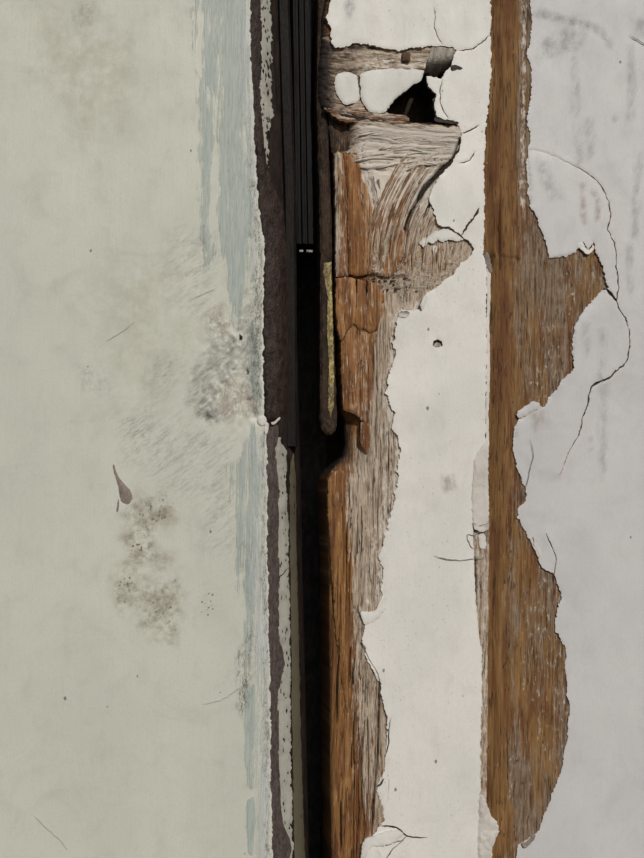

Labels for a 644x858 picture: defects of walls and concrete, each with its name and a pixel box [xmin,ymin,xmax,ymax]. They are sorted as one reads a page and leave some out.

peeling [334,72,360,106]
peeling [318,277,430,858]
peeling [419,229,463,253]
peeling [472,0,608,858]
crack [561,159,630,453]
crack [382,825,424,858]